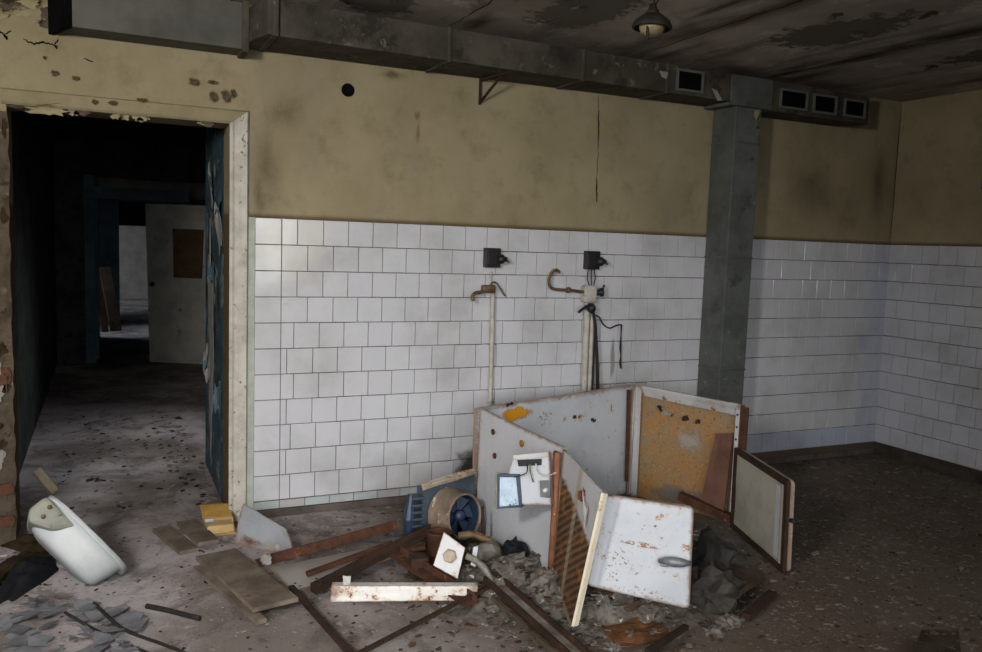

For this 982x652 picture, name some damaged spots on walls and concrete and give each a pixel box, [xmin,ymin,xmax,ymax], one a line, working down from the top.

peeling [110,113,150,122]
flaking render [189,78,237,102]
flaking render [0,102,92,545]
peeling [203,162,222,460]